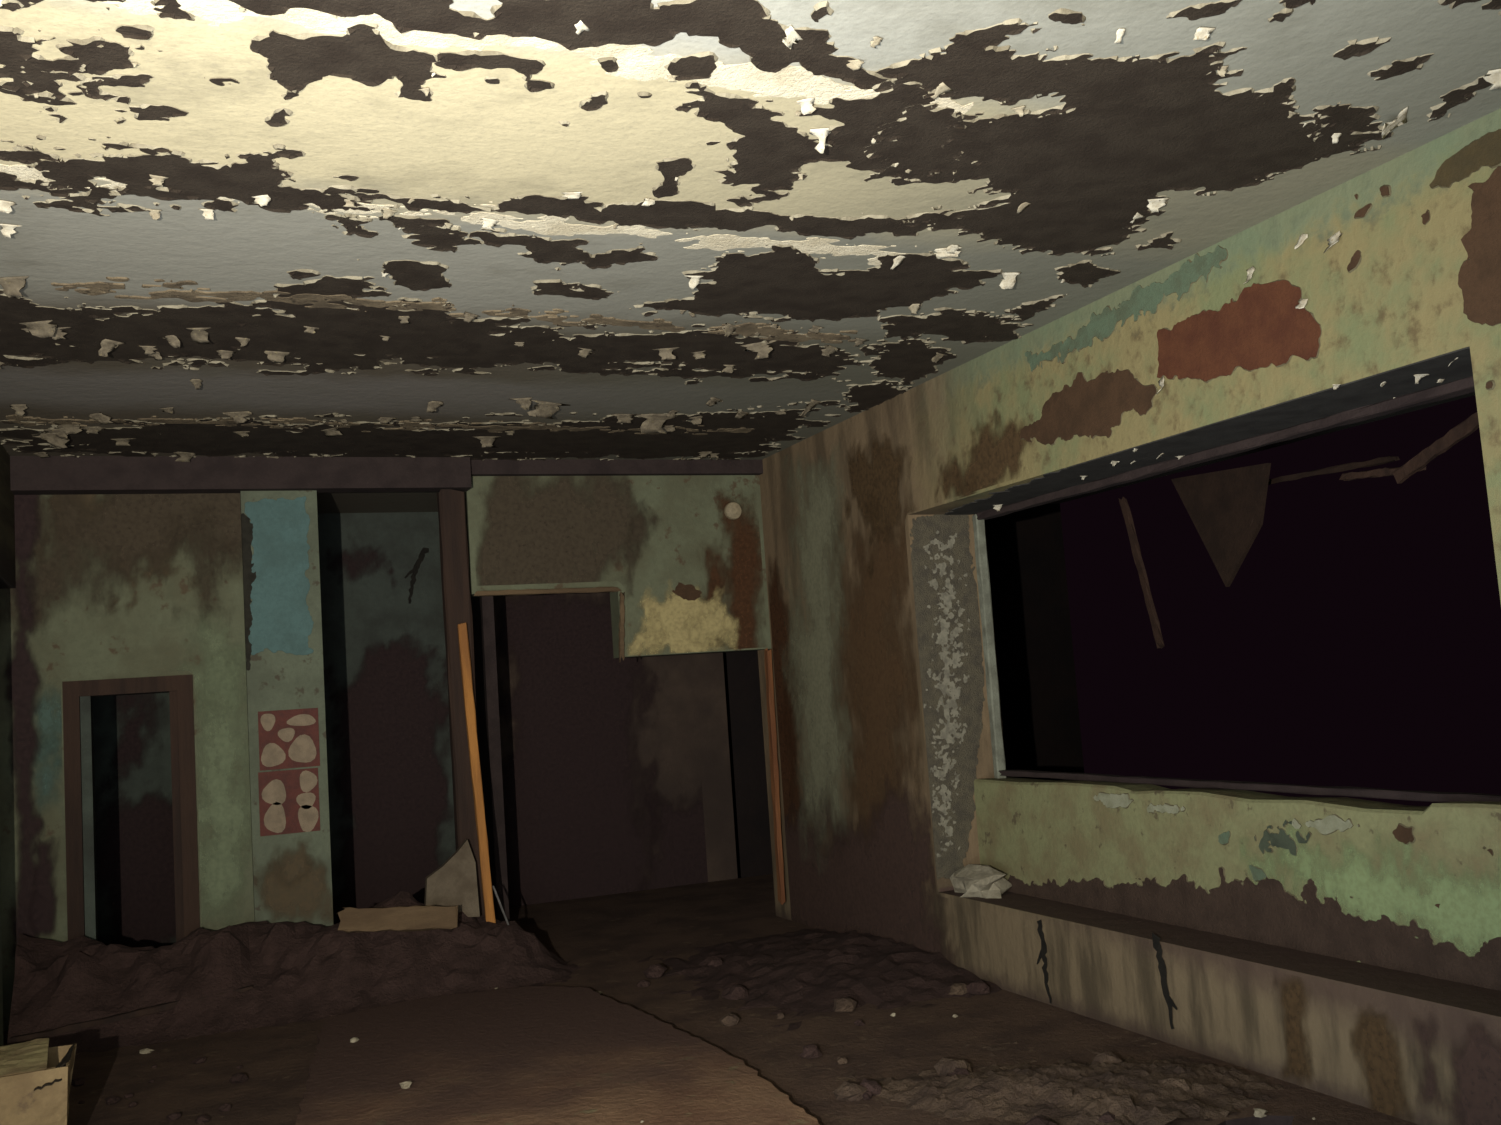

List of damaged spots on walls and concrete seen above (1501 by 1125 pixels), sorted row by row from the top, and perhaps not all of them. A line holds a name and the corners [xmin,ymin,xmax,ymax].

peeling [0,0,1501,880]
crack [1037,920,1051,1003]
crack [1152,933,1177,1029]
peeling [1006,814,1501,991]